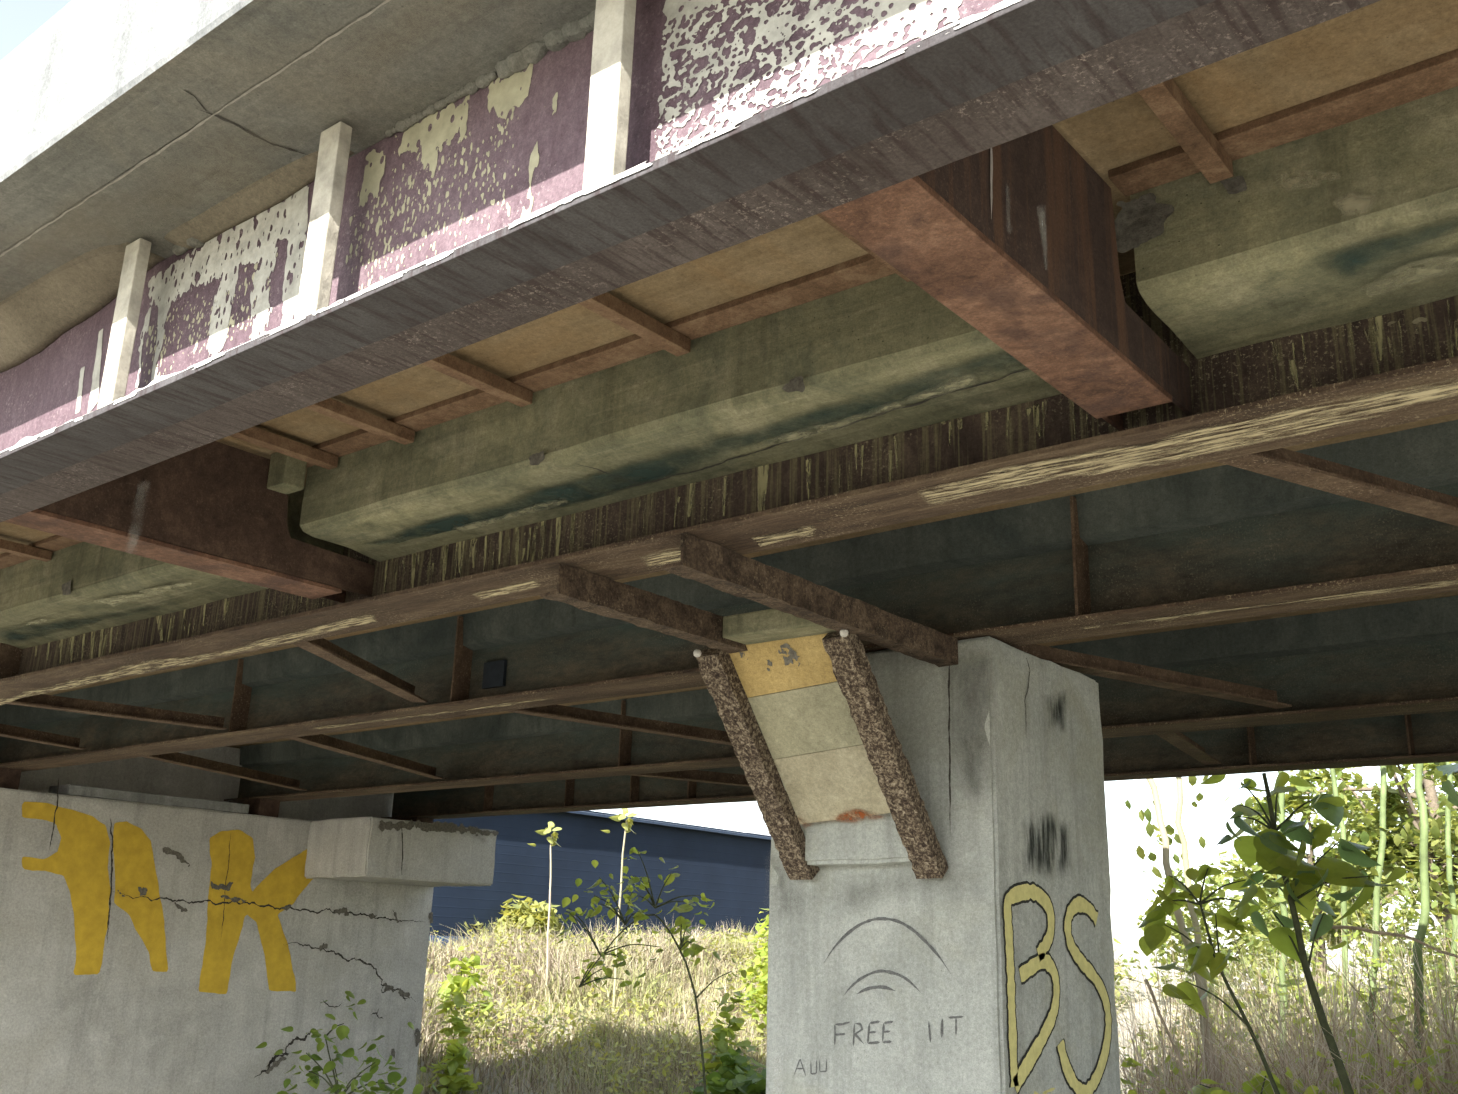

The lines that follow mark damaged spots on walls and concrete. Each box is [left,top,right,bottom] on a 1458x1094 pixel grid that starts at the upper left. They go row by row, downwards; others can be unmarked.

crack [0,0,390,257]
peeling [358,63,533,207]
peeling [508,0,1021,229]
peeling [0,186,453,453]
leakage [374,353,1022,592]
leakage [1274,335,1304,387]
leakage [1372,315,1400,372]
leakage [1328,226,1458,294]
rust [837,810,881,821]
crack [107,819,433,1078]